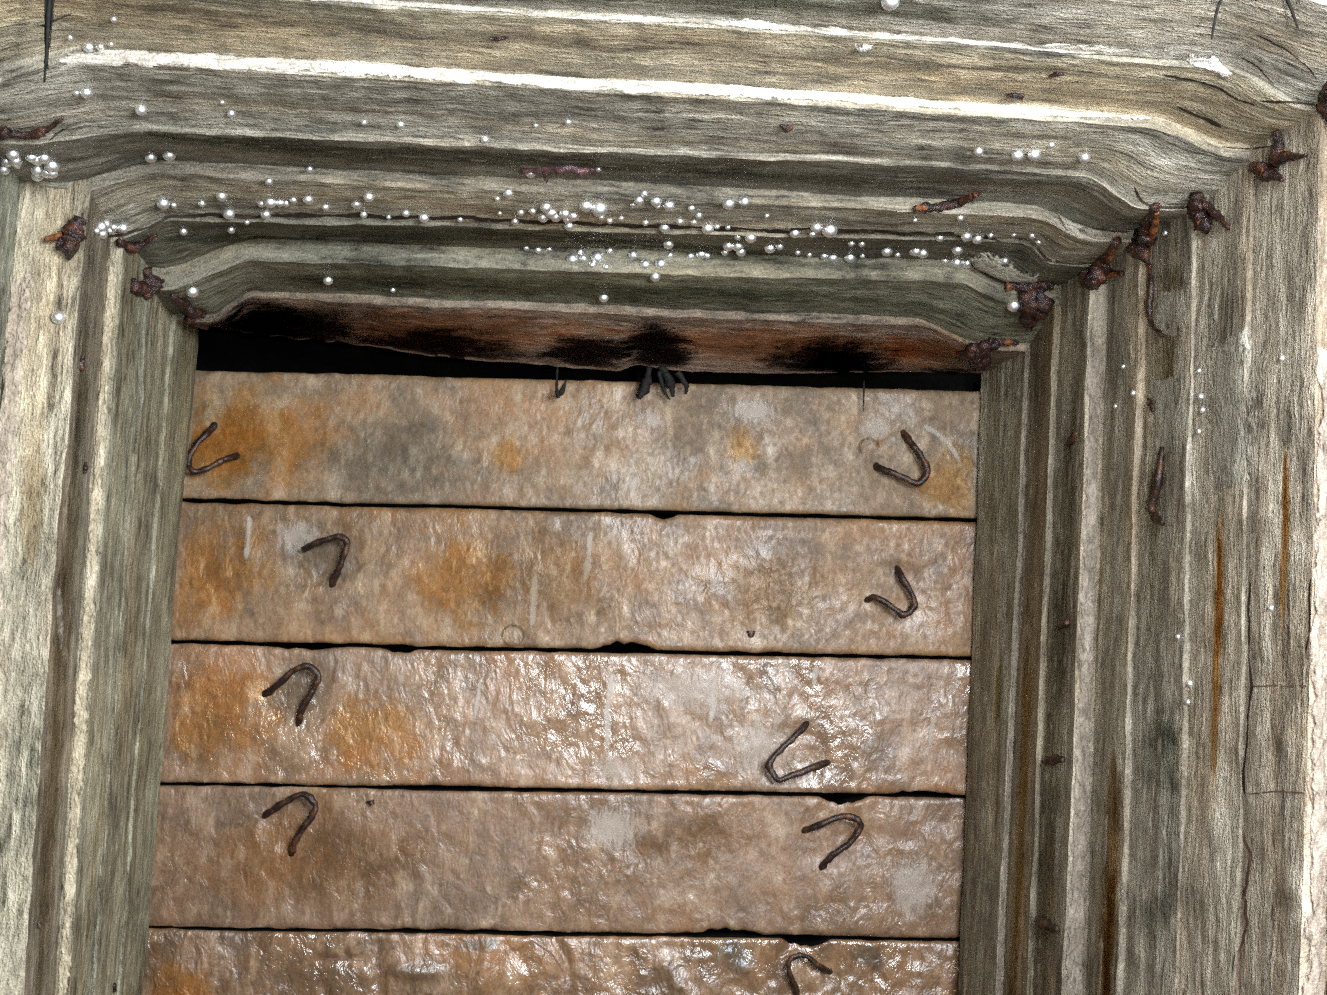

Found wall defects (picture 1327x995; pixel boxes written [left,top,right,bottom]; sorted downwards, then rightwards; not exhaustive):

rust [45,231,63,242]
damp [209,299,695,369]
damp [756,338,971,375]